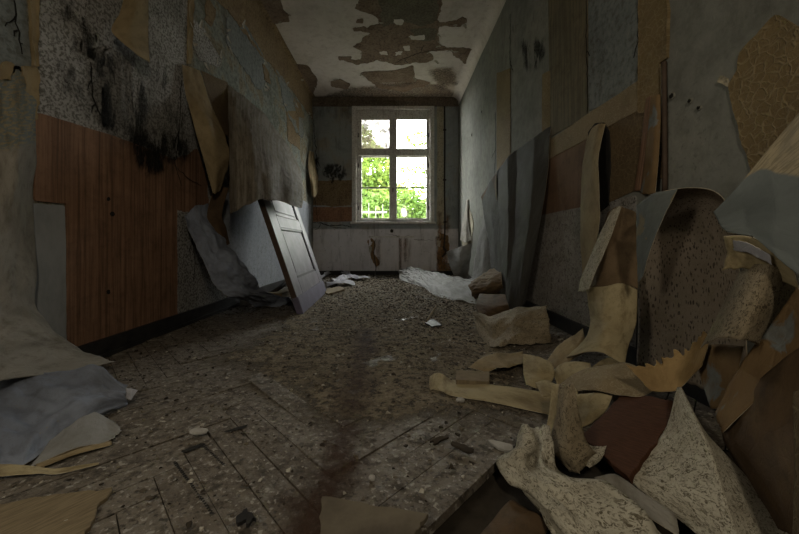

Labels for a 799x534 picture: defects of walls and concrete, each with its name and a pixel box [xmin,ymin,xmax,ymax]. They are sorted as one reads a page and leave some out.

crack [5,0,23,54]
peeling [296,64,318,94]
peeling [338,0,472,92]
damp [128,80,188,173]
peeling [634,92,675,195]
corrosion [436,213,452,271]